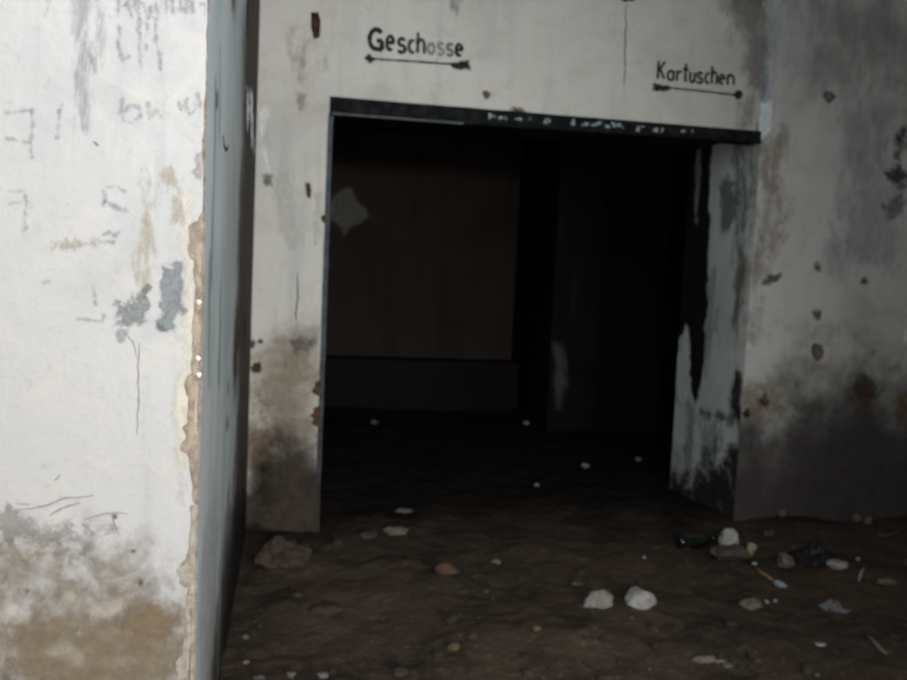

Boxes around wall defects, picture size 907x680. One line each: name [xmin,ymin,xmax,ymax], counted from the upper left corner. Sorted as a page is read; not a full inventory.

spalling [116,214,206,680]